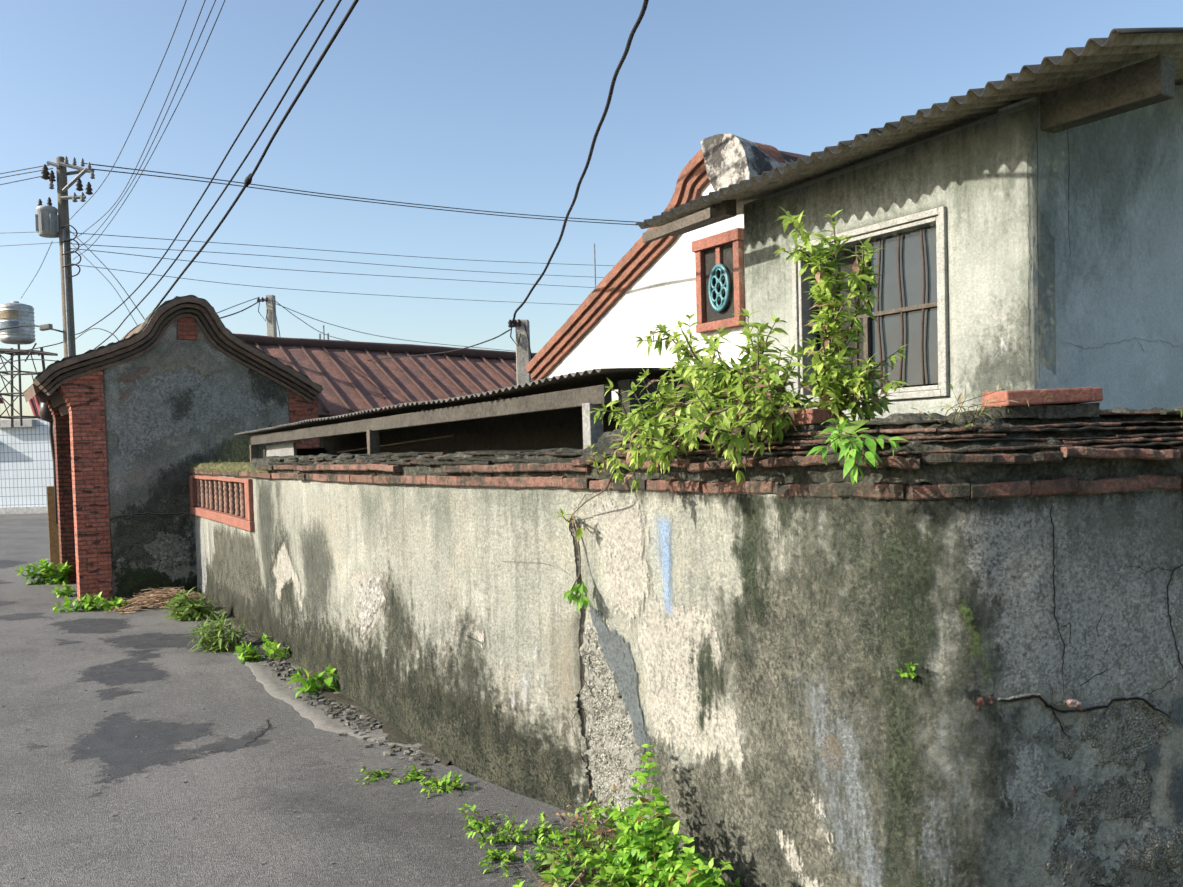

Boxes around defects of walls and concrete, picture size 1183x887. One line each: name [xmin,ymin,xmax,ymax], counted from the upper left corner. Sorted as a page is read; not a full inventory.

spalling [144,531,196,571]
water stain [110,425,597,815]
crack [510,492,597,810]
peeling [570,497,744,831]
water stain [635,490,1182,887]
peeling [951,490,1183,887]
crack [996,506,1183,736]